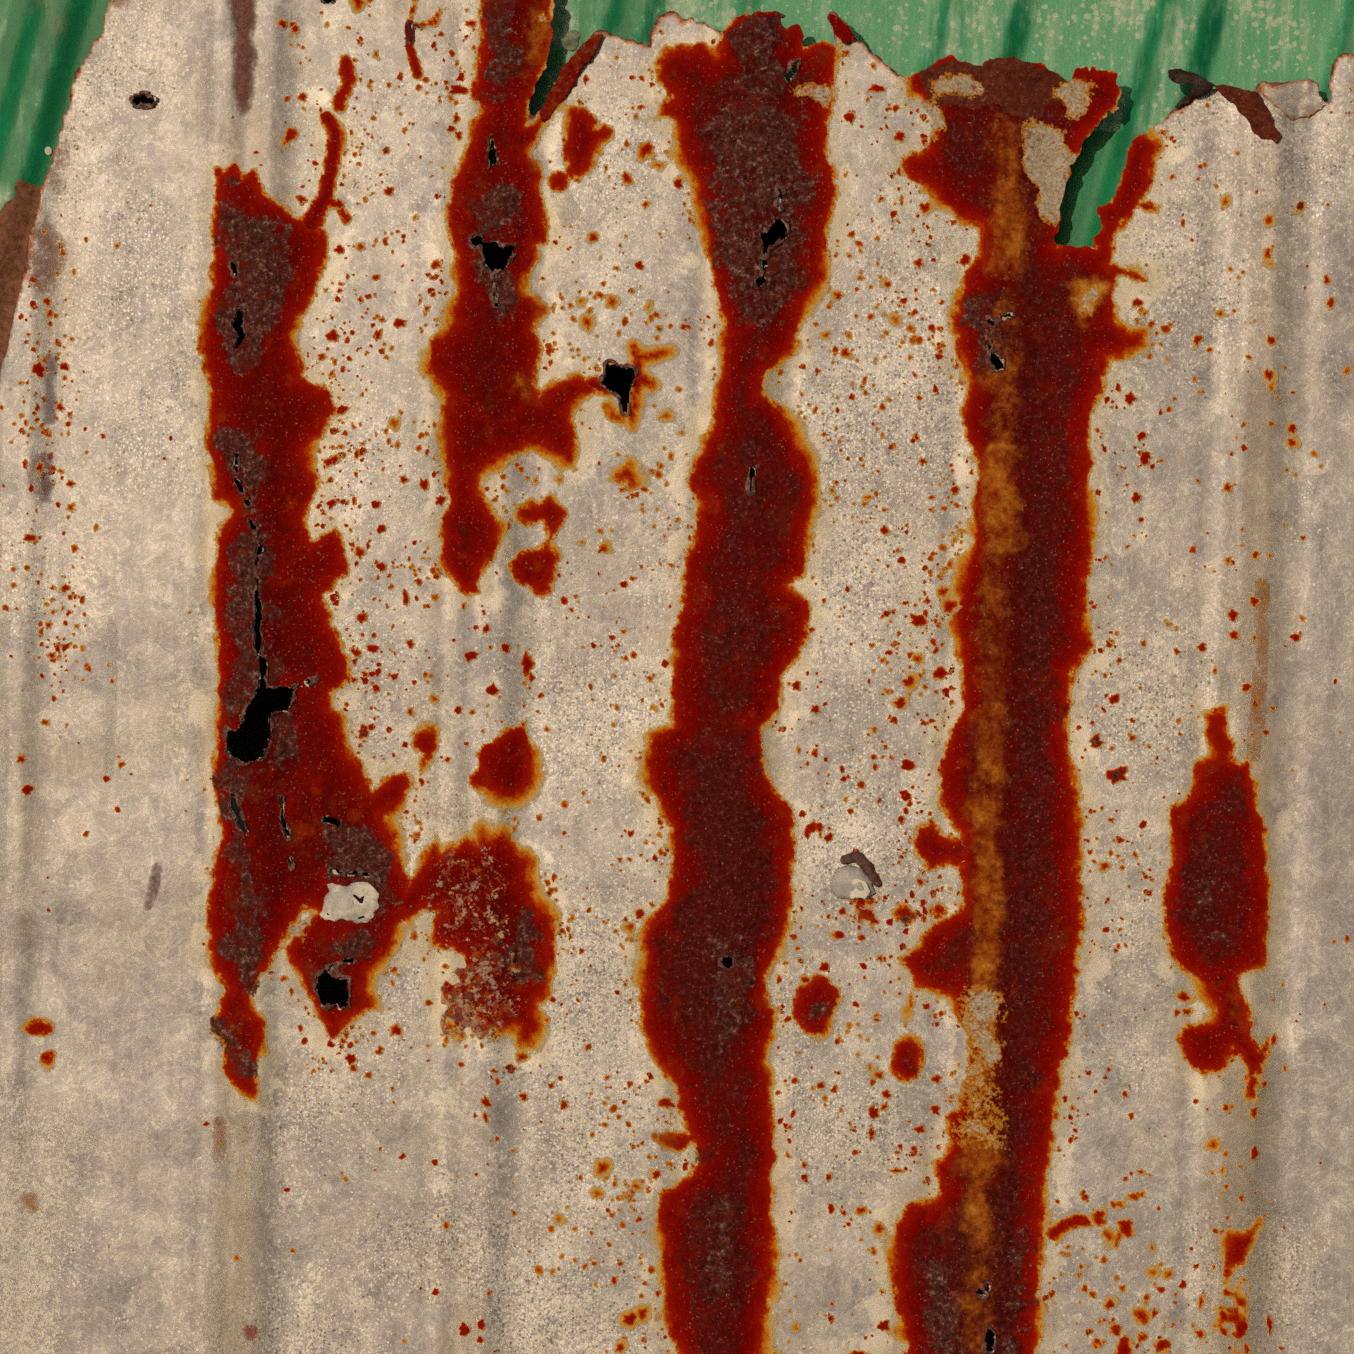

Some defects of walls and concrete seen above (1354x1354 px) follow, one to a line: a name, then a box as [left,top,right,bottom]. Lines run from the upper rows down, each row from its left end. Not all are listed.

corrosion [1292,200,1307,216]
corrosion [1244,354,1296,399]
corrosion [1268,420,1323,469]
corrosion [1283,613,1314,648]
corrosion [195,0,1278,1354]
corrosion [1266,1315,1285,1351]